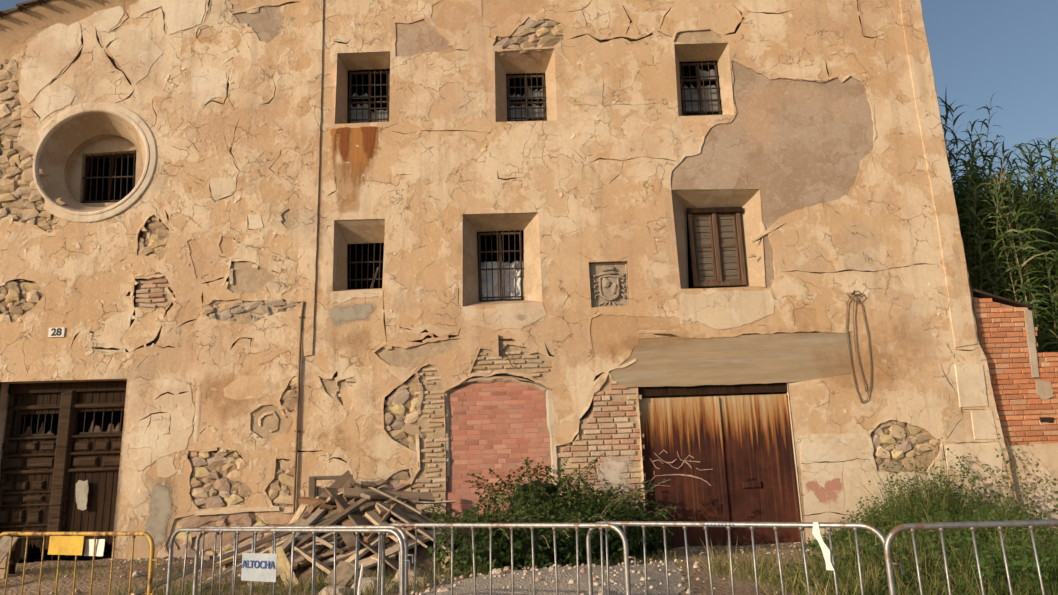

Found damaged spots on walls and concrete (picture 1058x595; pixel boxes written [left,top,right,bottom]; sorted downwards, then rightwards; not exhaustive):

crack [48,0,302,104]
crack [204,75,229,108]
peeling [391,0,469,65]
crack [568,2,673,43]
crack [209,130,264,230]
rust [330,126,378,184]
peeling [669,58,877,330]
flaking render [0,0,304,563]
crack [69,209,280,353]
flaking render [463,302,563,383]
flaking render [555,312,648,519]
peeling [800,417,1004,543]